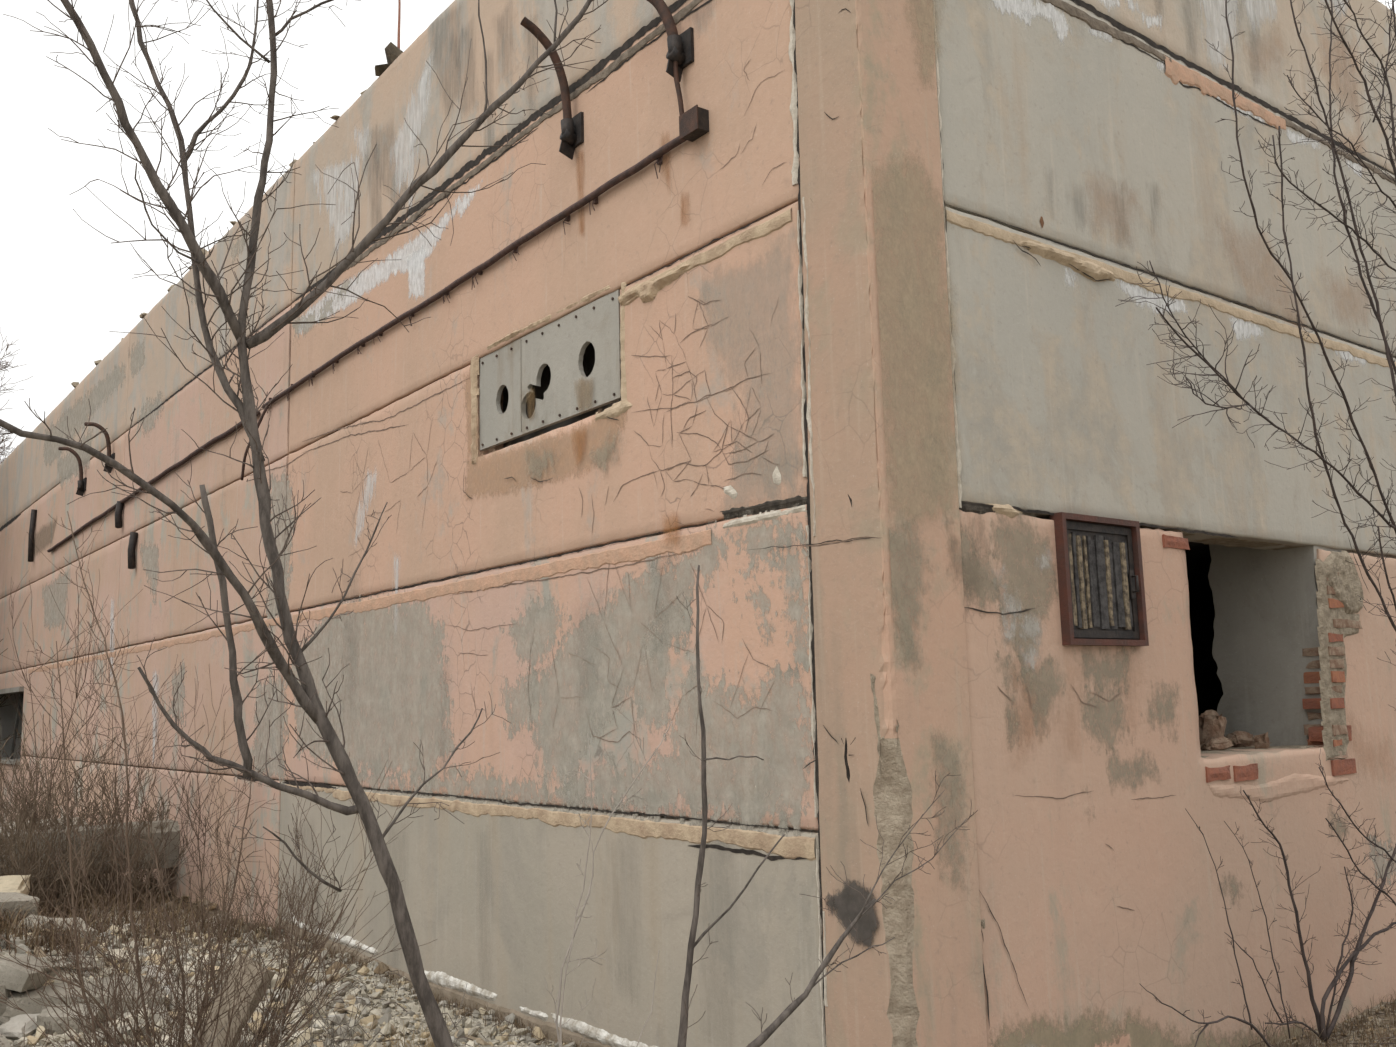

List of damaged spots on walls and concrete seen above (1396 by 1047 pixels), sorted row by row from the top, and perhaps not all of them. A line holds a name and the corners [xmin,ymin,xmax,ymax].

peeling [292,274,359,337]
crack [131,0,712,561]
peeling [266,467,294,631]
crack [237,0,879,1034]
flaking render [1162,534,1190,550]
peeling [252,519,813,836]
flaking render [1205,550,1364,803]